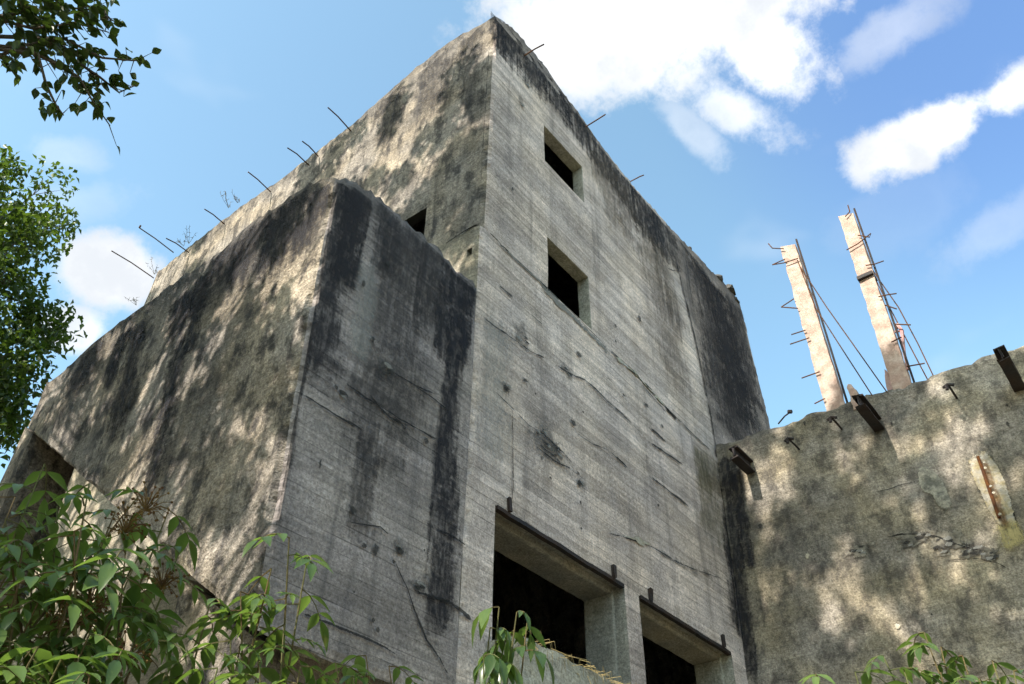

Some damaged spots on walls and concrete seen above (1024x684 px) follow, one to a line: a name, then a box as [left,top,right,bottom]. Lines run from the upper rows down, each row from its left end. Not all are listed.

water stain [375,91,402,143]
water stain [421,14,764,441]
water stain [142,183,476,633]
water stain [718,457,758,676]
crack [888,533,1008,569]
spalling [969,451,1024,548]